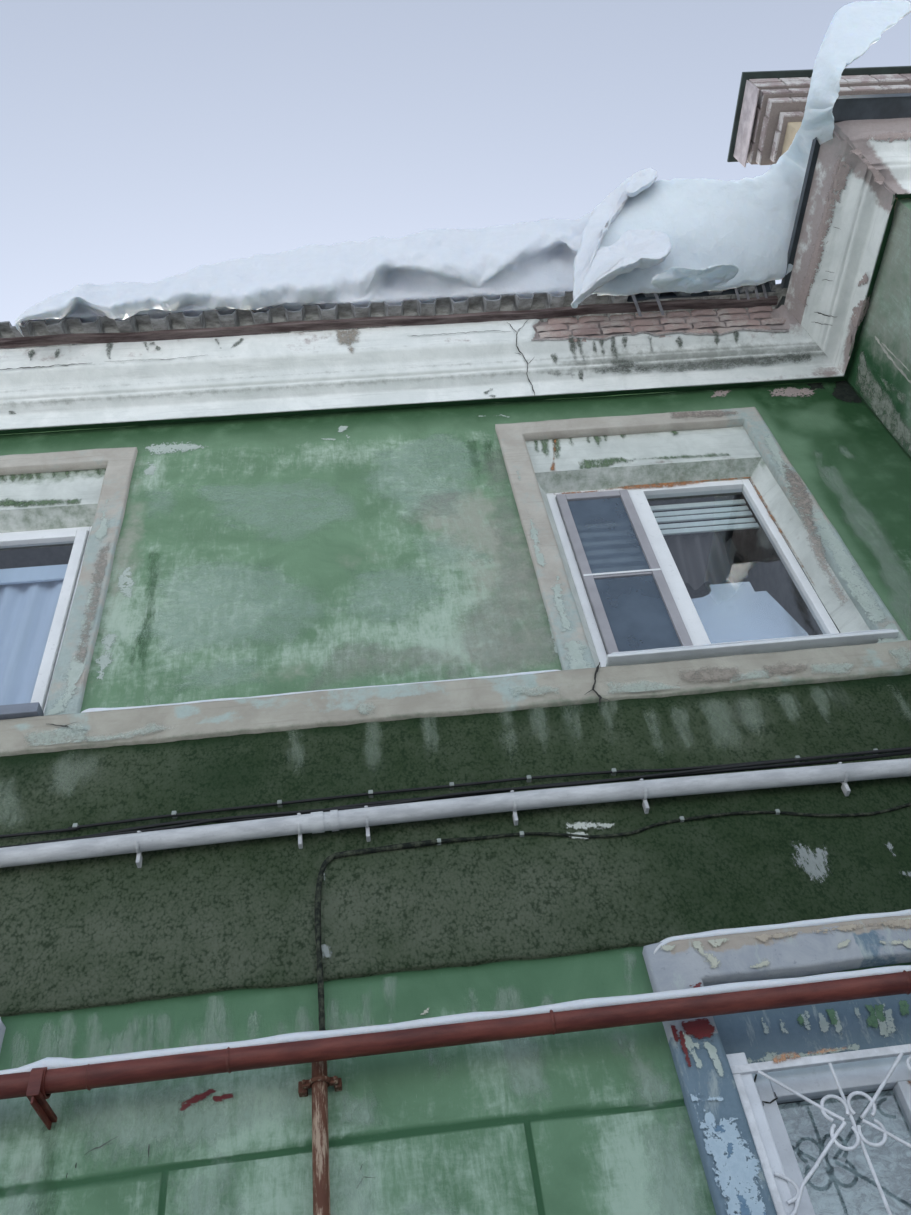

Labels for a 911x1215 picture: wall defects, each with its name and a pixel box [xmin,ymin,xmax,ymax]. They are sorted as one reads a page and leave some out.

spalling [531,306,789,342]
crack [412,320,535,396]
peeling [144,441,208,475]
crack [584,662,609,706]
peeling [747,1009,860,1063]
peeling [855,1000,910,1038]
peeling [690,1094,768,1215]